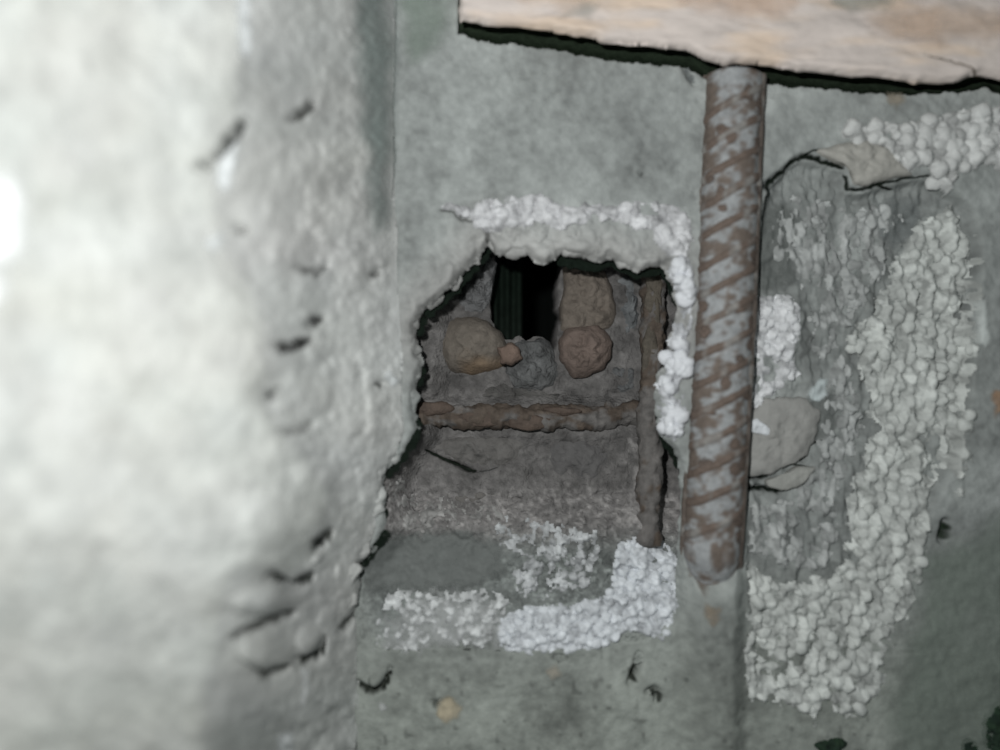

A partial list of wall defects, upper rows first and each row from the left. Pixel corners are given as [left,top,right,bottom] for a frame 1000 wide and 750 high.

rust [716,124,737,144]
crack [760,149,929,236]
spalling [488,221,549,260]
spalling [427,276,463,310]
damp [441,193,698,441]
rust [735,307,753,362]
spalling [373,445,405,518]
rust [729,434,748,489]
crack [747,475,781,493]
damp [743,102,1000,750]
spalling [342,542,371,626]
damp [367,478,679,656]